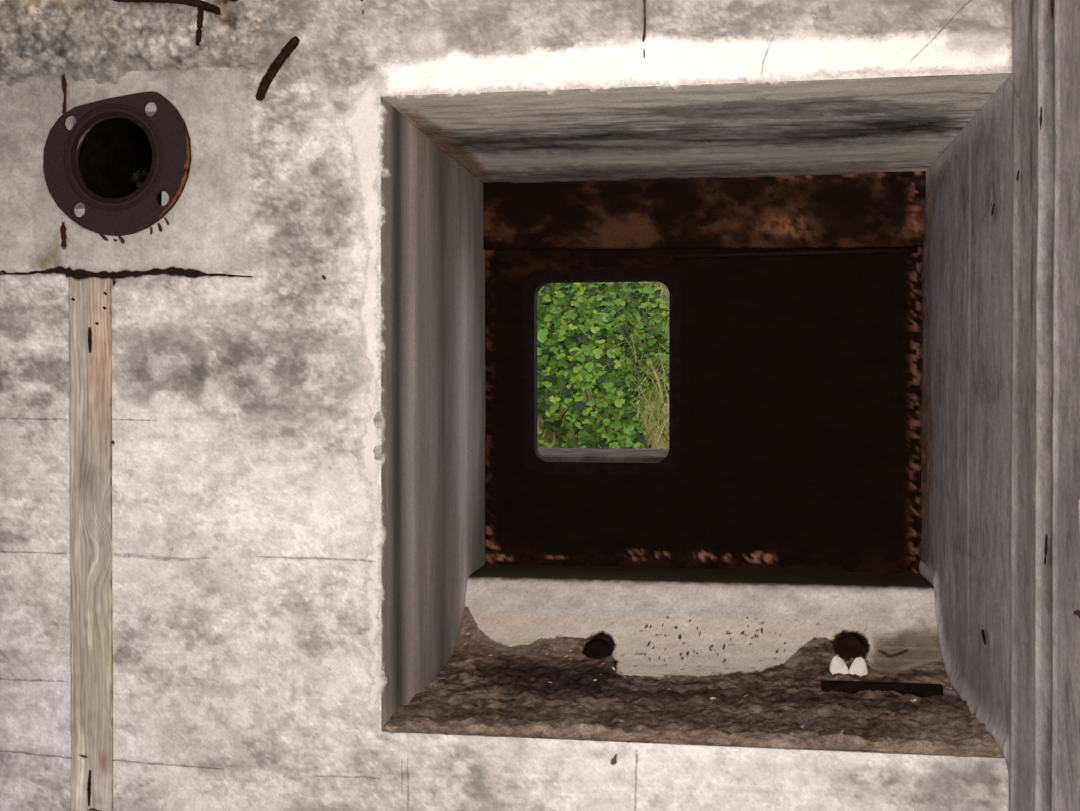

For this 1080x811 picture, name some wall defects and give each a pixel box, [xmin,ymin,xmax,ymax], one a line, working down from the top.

crack [640,0,648,58]
rust [150,136,190,235]
crack [0,266,253,286]